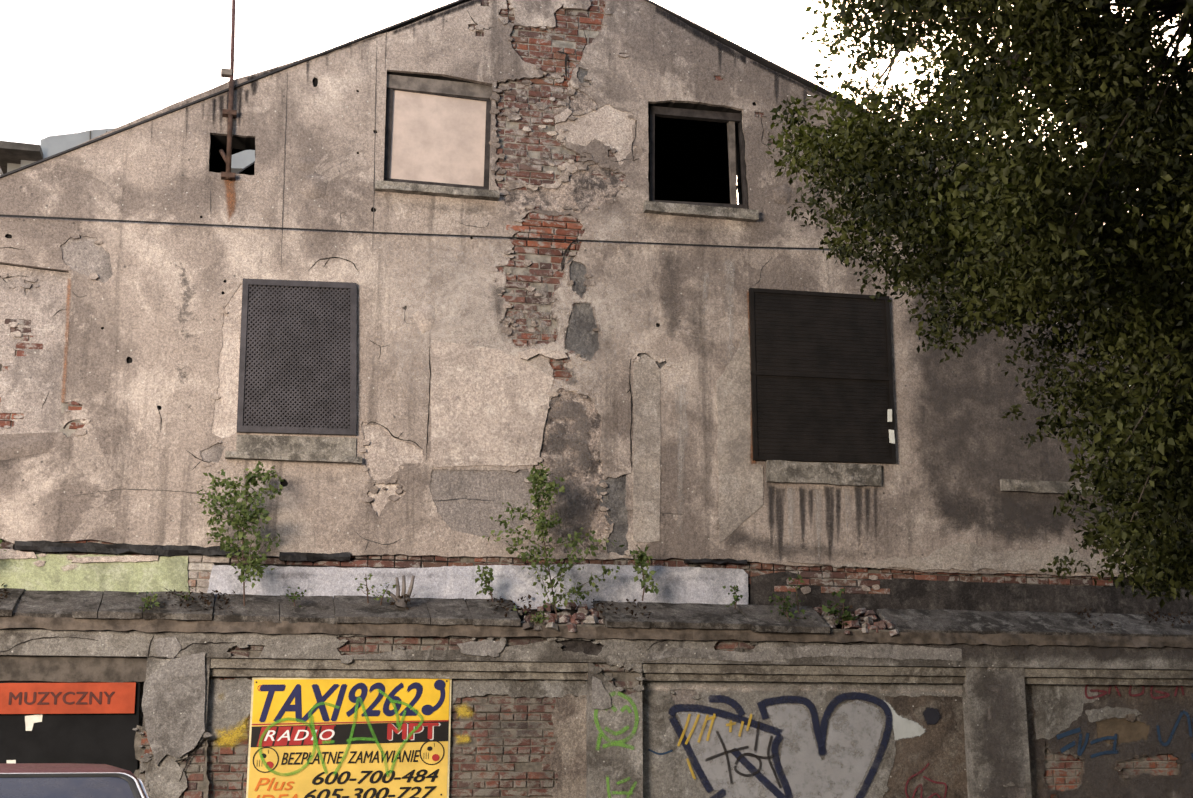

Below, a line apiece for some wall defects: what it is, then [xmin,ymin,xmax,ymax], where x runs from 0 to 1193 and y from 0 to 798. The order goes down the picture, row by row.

rust [225,180,235,217]
flaking render [60,233,113,283]
flaking render [177,0,1119,594]
spalling [0,318,43,371]
spalling [0,397,24,428]
spalling [59,401,90,437]
damp [730,487,841,557]
damp [855,487,877,535]
spalling [220,643,264,659]
flaking render [132,637,252,798]
flaking render [336,636,968,798]
flaking render [1031,684,1184,798]